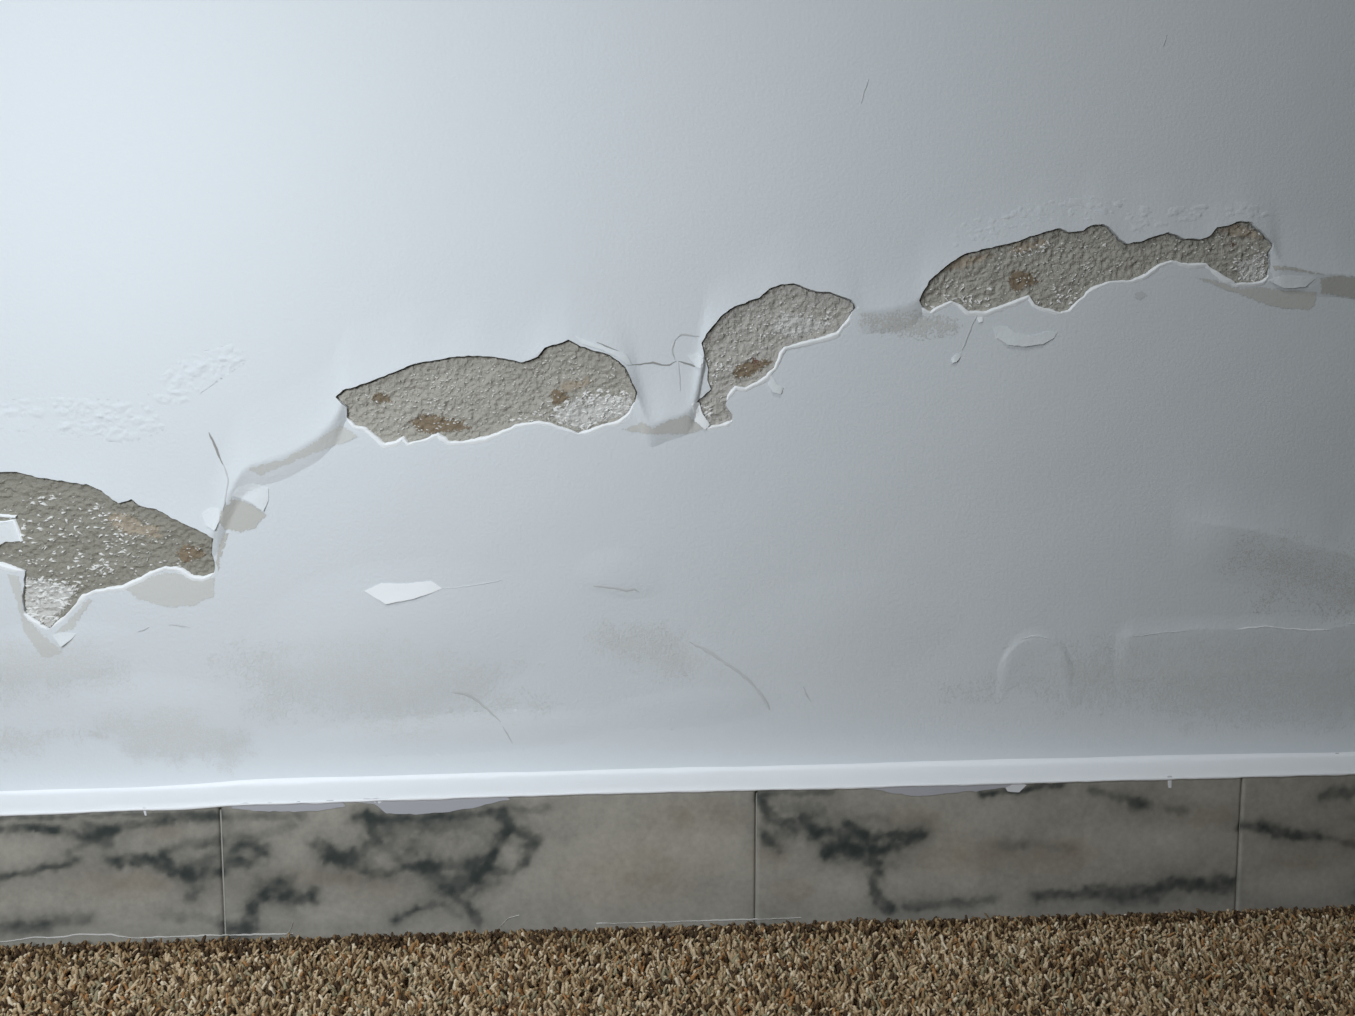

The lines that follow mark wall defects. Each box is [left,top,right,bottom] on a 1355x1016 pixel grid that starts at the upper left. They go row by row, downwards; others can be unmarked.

spalling [337,335,637,448]
spalling [688,284,854,431]
spalling [919,222,1317,347]
spalling [0,472,220,647]
peeling [232,483,269,511]
damp [0,576,563,777]
peeling [365,581,442,604]
damp [938,528,1355,737]